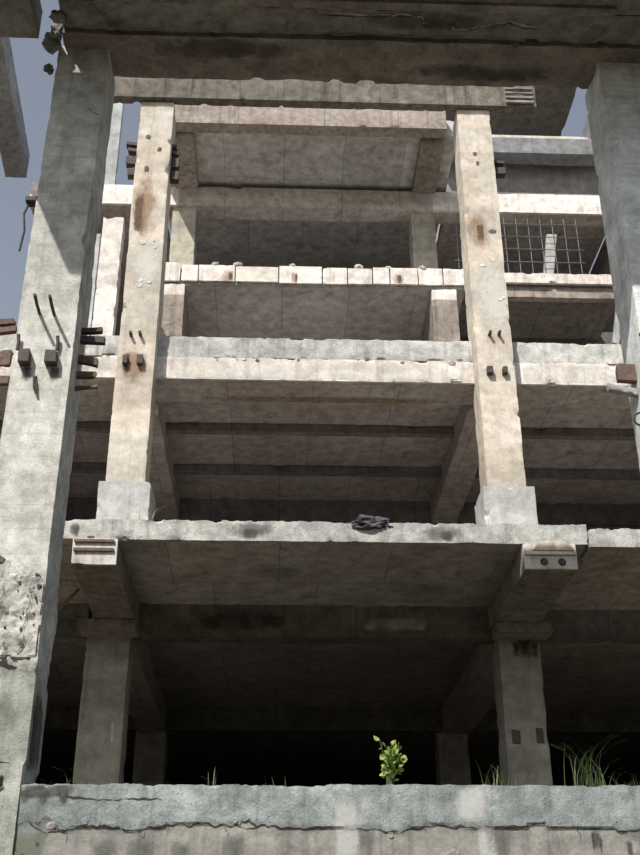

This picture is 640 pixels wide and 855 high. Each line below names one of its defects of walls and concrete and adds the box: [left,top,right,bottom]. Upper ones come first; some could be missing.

crack [317,12,553,32]
rust [134,194,152,231]
rust [473,220,484,244]
spalling [0,554,48,660]
crack [19,794,640,841]